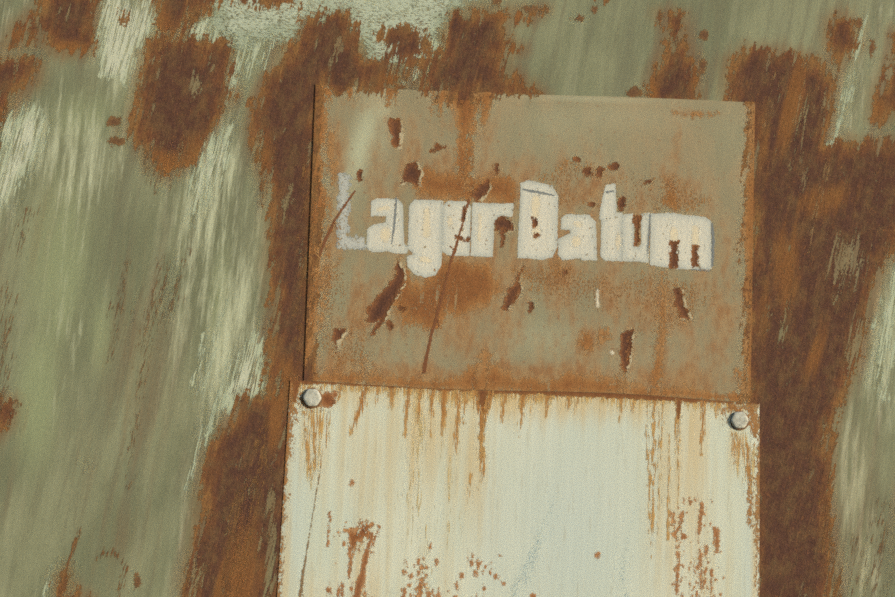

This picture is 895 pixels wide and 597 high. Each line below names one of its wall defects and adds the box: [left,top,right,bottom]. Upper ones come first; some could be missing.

corrosion [0,0,102,159]
corrosion [106,0,242,195]
corrosion [0,280,22,432]
corrosion [180,0,895,597]
corrosion [48,526,91,597]
corrosion [96,546,143,597]